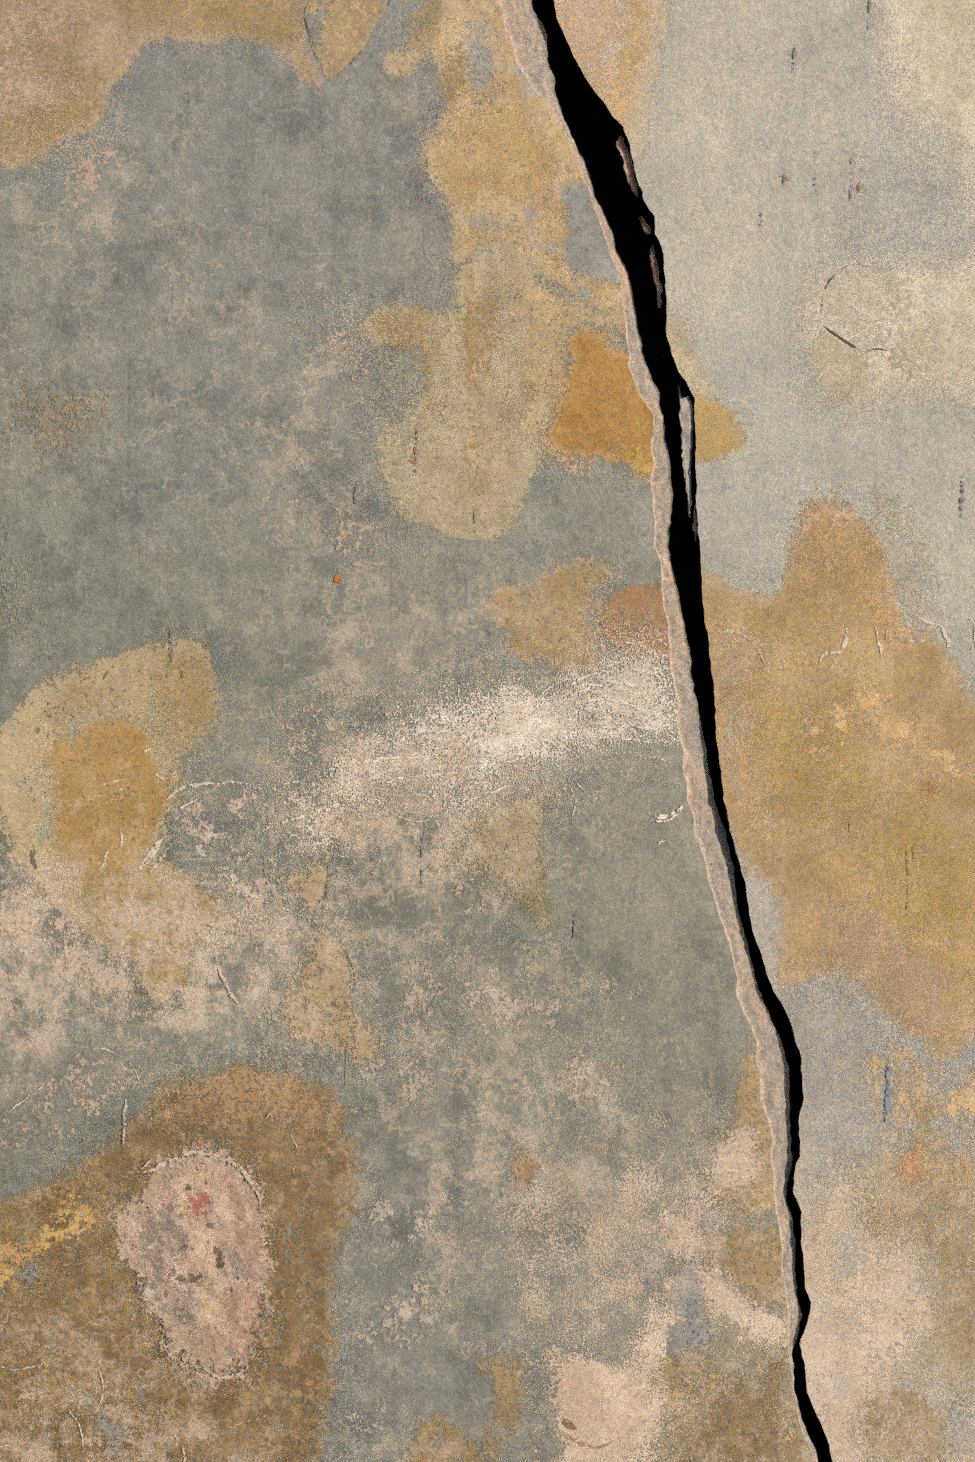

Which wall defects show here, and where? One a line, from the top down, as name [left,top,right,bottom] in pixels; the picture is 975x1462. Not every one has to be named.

damp [37,117,138,218]
damp [279,288,383,390]
damp [368,0,629,436]
damp [666,290,752,475]
crack [497,0,832,1462]
damp [0,478,975,1462]